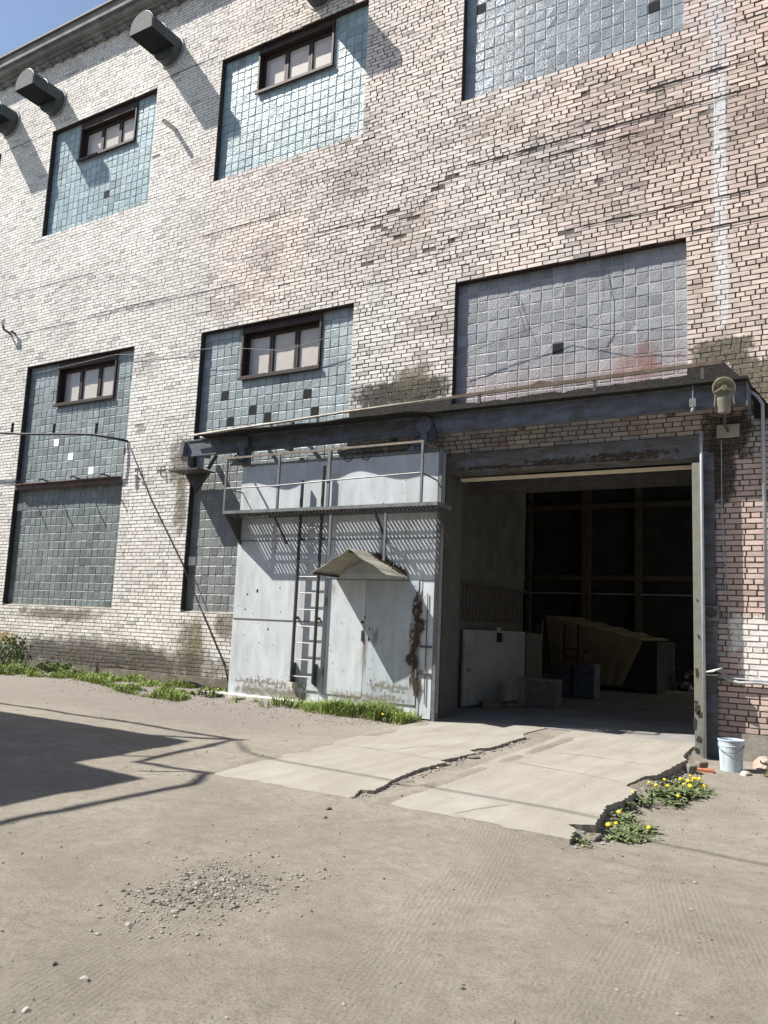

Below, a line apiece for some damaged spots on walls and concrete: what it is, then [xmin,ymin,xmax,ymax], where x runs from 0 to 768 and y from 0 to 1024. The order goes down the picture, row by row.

leakage [712,28,729,329]
leakage [353,363,451,408]
leakage [178,621,203,677]
leakage [214,615,232,636]
corrosion [404,586,425,699]